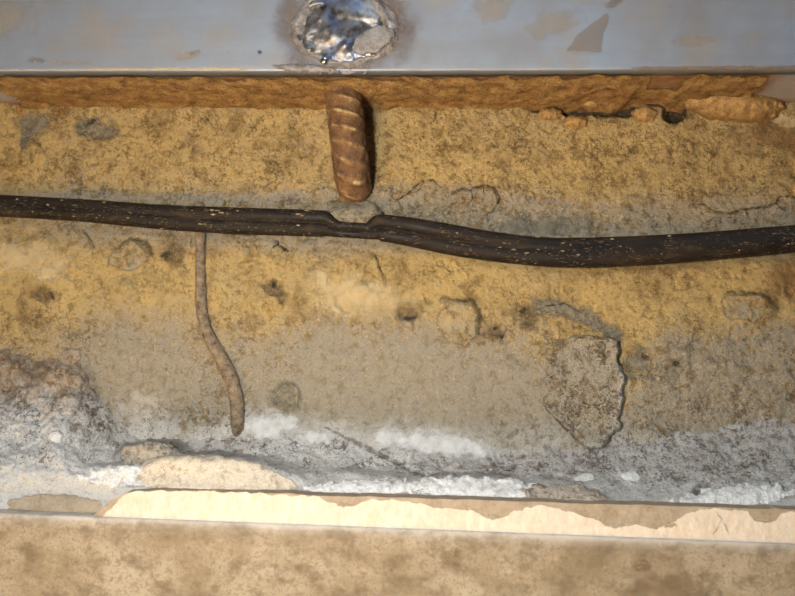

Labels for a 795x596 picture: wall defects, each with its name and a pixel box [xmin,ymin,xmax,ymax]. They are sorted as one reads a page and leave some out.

spalling [74,117,120,140]
spalling [324,85,372,203]
crack [454,185,508,213]
crack [692,195,794,216]
spalling [161,244,183,265]
spalling [31,287,54,302]
spalling [265,280,284,296]
spalling [490,327,505,339]
spalling [519,299,652,451]
damp [242,414,330,444]
damp [374,429,494,459]
spalling [102,490,795,543]